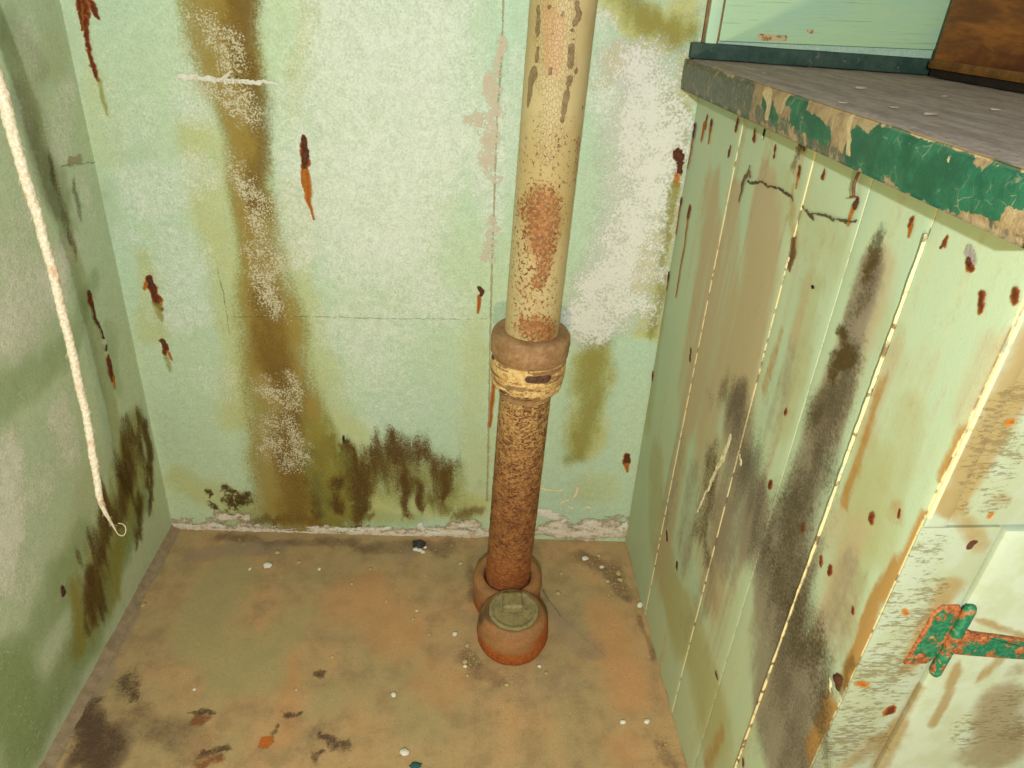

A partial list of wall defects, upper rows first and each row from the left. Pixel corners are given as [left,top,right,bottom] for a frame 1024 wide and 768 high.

rust [75,0,108,116]
rust [87,290,116,389]
rust [143,275,164,321]
rust [299,135,315,220]
water stain [178,0,461,532]
peeling [463,34,508,185]
water stain [559,0,698,461]
rust [666,115,713,295]
crack [738,165,857,224]
water stain [69,407,154,658]
water stain [738,231,883,768]
water stain [71,697,125,768]